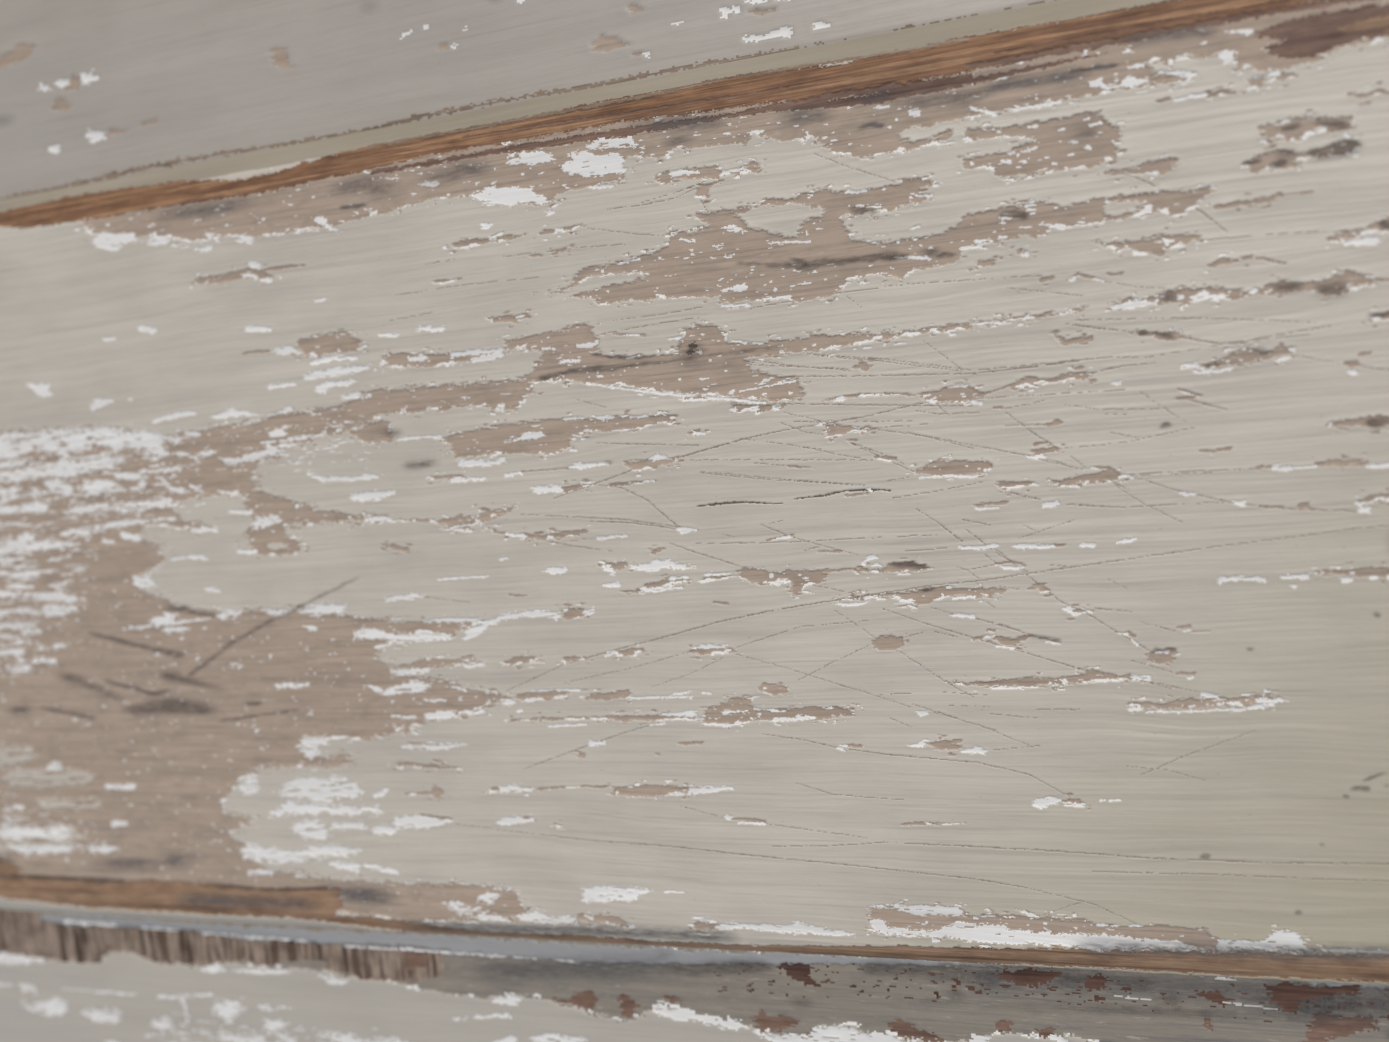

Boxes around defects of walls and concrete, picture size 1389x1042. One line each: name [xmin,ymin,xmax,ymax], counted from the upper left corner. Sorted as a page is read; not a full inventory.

peeling [37,69,99,92]
peeling [74,0,1389,495]
peeling [0,397,301,674]
peeling [307,469,627,545]
crack [697,487,891,507]
peeling [598,545,1007,618]
peeling [874,454,1134,510]
peeling [958,542,1097,570]
peeling [1217,562,1389,588]
peeling [871,629,909,652]
peeling [946,629,1289,714]
peeling [0,734,1389,1042]